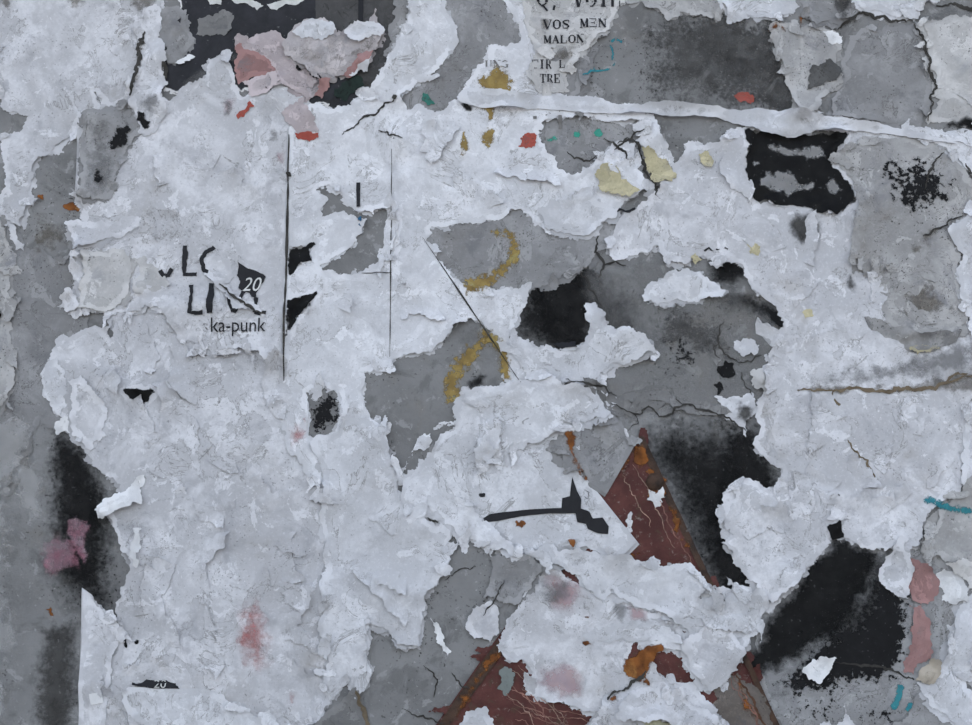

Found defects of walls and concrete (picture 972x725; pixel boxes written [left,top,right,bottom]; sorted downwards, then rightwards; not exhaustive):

crack [936,2,972,12]
crack [838,11,938,120]
crack [342,94,402,196]
crack [372,220,392,335]
crack [423,238,521,382]
rust [565,431,587,480]
peeling [470,645,493,662]
rust [623,644,664,686]
crack [836,662,914,680]